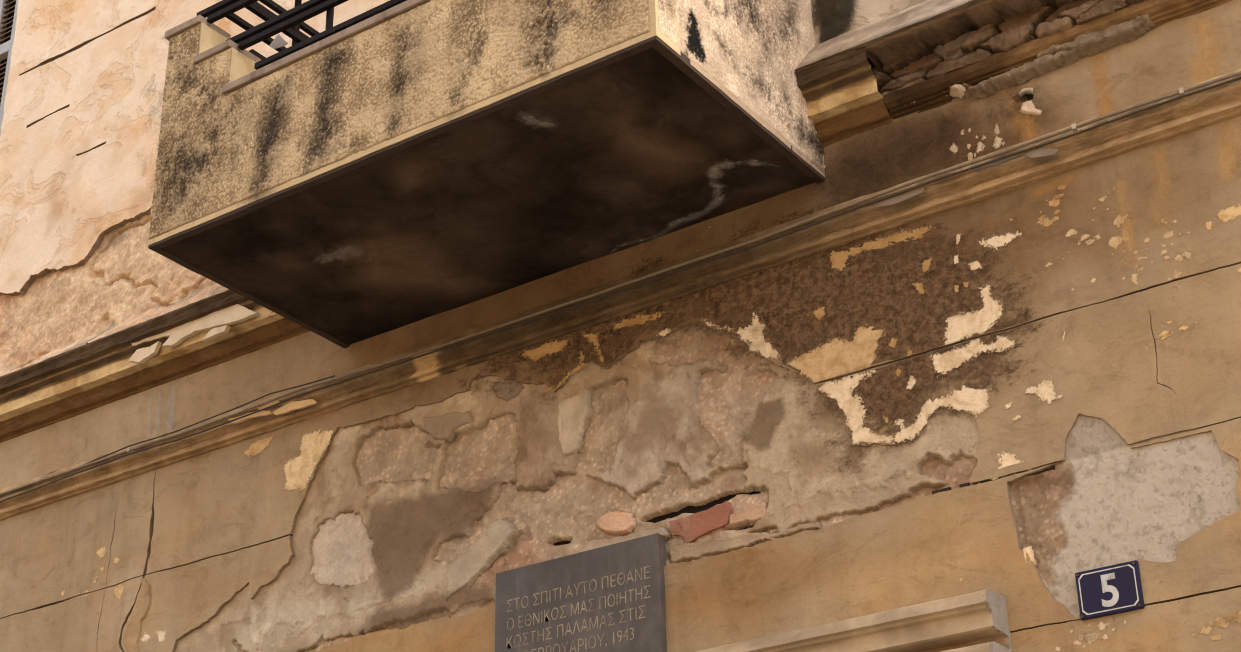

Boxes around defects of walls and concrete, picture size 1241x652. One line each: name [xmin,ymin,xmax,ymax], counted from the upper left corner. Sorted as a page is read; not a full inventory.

damp [685,11,706,62]
damp [717,0,766,47]
damp [162,126,218,212]
damp [251,82,288,197]
damp [308,52,344,164]
damp [798,121,824,166]
peeling [949,123,1061,171]
peeling [1037,185,1066,227]
peeling [1045,197,1191,284]
peeling [1205,204,1241,230]
spalling [0,214,229,377]
spalling [129,218,1241,652]